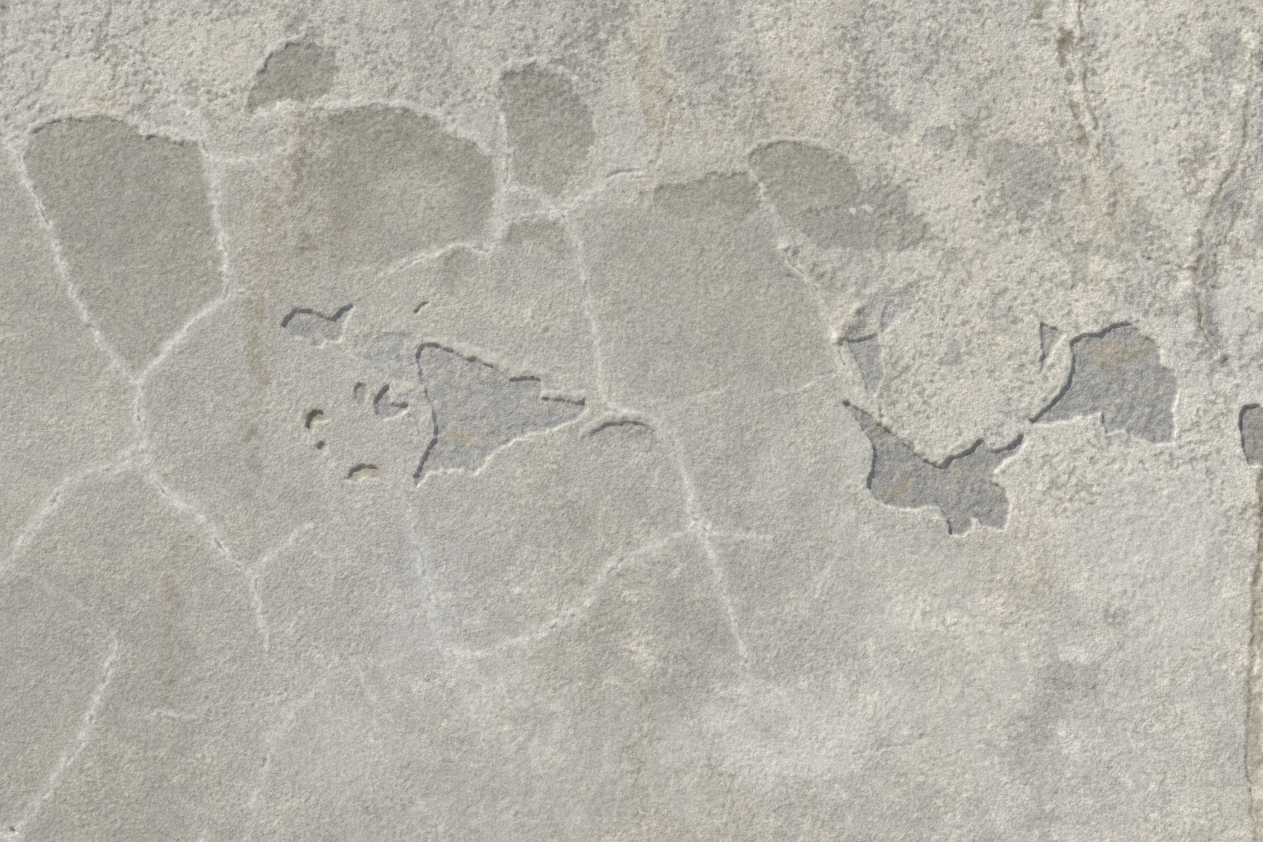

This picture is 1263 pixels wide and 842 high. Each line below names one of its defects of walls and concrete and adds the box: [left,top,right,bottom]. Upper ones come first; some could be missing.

crack [0,0,316,842]
peeling [244,32,498,315]
crack [194,82,847,842]
peeling [491,56,599,199]
peeling [281,135,935,488]
crack [747,164,889,416]
spalling [842,285,1182,537]
spalling [1238,403,1263,467]
leakage [262,406,1263,842]